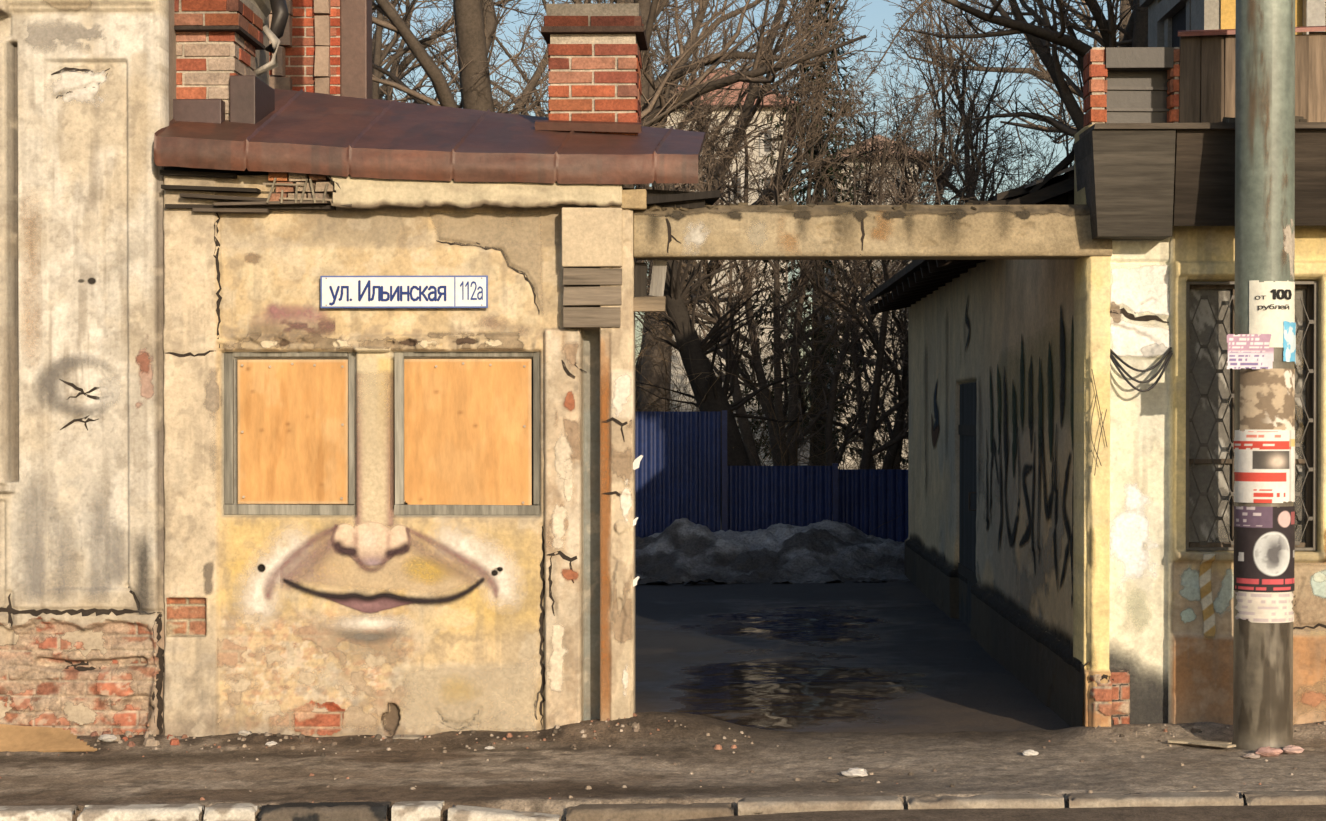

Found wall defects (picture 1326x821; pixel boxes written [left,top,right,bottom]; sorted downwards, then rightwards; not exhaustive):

peeling [53,71,106,102]
peeling [431,213,542,306]
crack [1110,308,1169,323]
crack [59,379,108,430]
peeling [612,375,631,427]
peeling [547,391,579,549]
peeling [612,448,632,531]
peeling [1180,550,1234,637]
spalling [1293,562,1326,632]
spalling [0,598,534,736]
peeling [547,624,567,691]
flaking render [1089,672,1130,725]